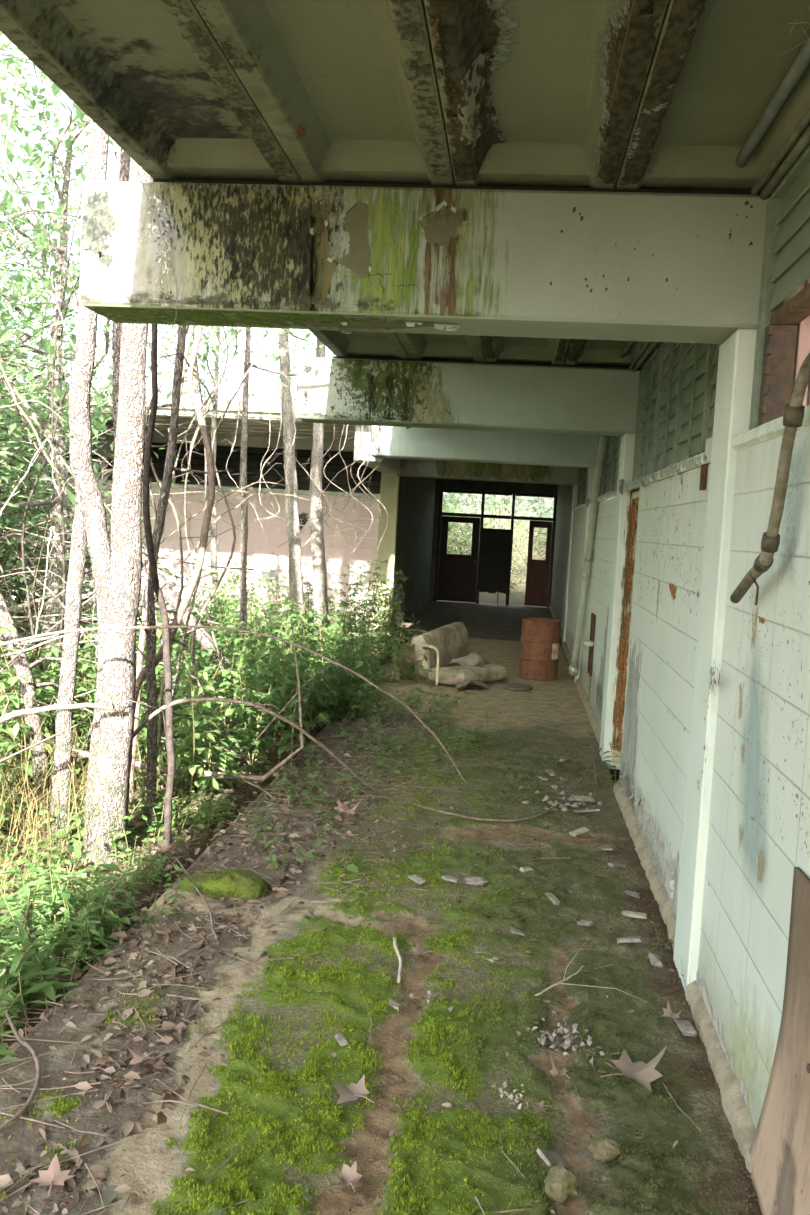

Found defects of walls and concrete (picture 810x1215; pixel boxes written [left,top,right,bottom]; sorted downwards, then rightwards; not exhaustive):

water stain [10,0,346,312]
peeling [309,200,371,305]
rust [424,236,459,316]
rust [421,188,464,215]
peeling [419,201,468,246]
rust [611,489,638,751]